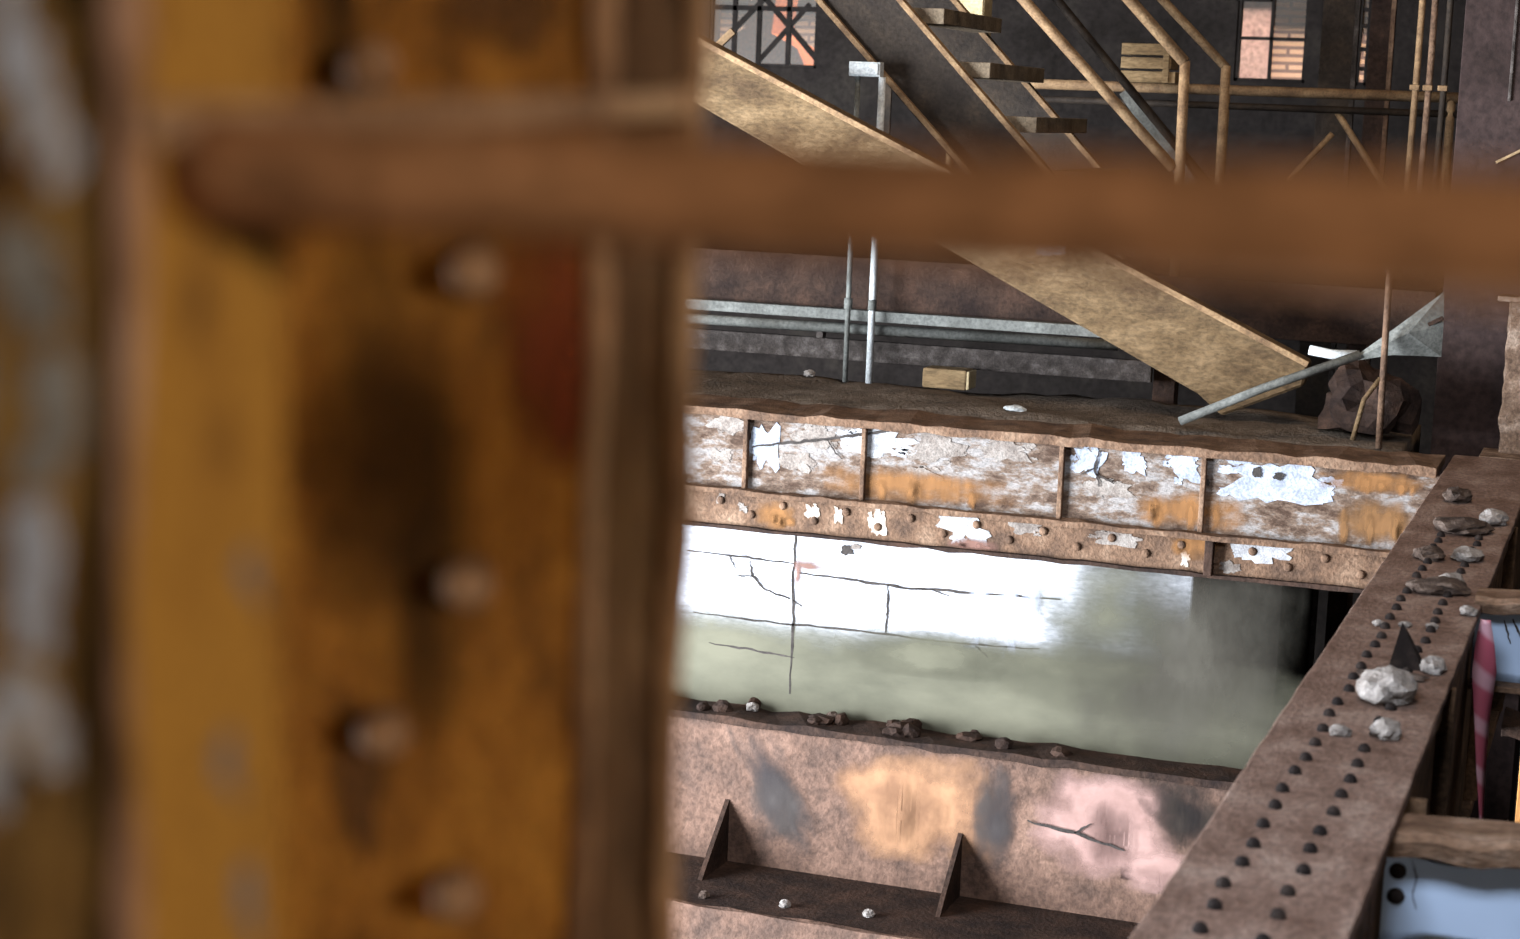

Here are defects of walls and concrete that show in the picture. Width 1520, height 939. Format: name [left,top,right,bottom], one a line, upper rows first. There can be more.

peeling [705,416,1038,477]
peeling [1069,447,1343,506]
peeling [804,503,843,524]
peeling [841,509,887,556]
peeling [935,516,991,543]
peeling [1087,530,1143,548]
crack [693,536,1060,694]
corrosion [1036,777,1181,891]